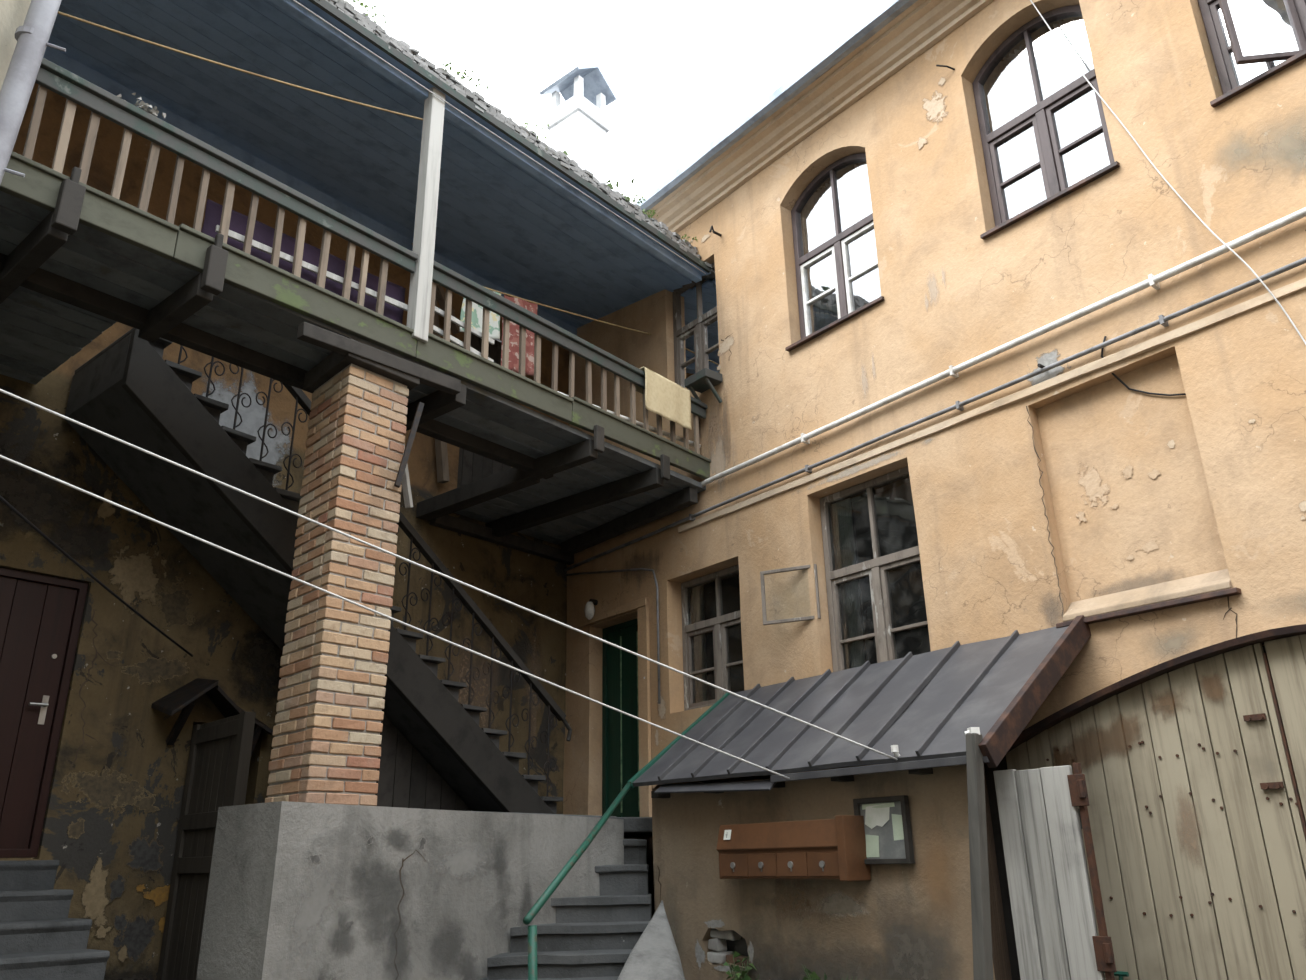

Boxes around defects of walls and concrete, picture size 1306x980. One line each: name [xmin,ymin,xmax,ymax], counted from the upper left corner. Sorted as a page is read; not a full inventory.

flaking render [922,77,949,125]
crack [1026,406,1063,619]
crack [397,850,426,929]
spalling [695,919,754,973]